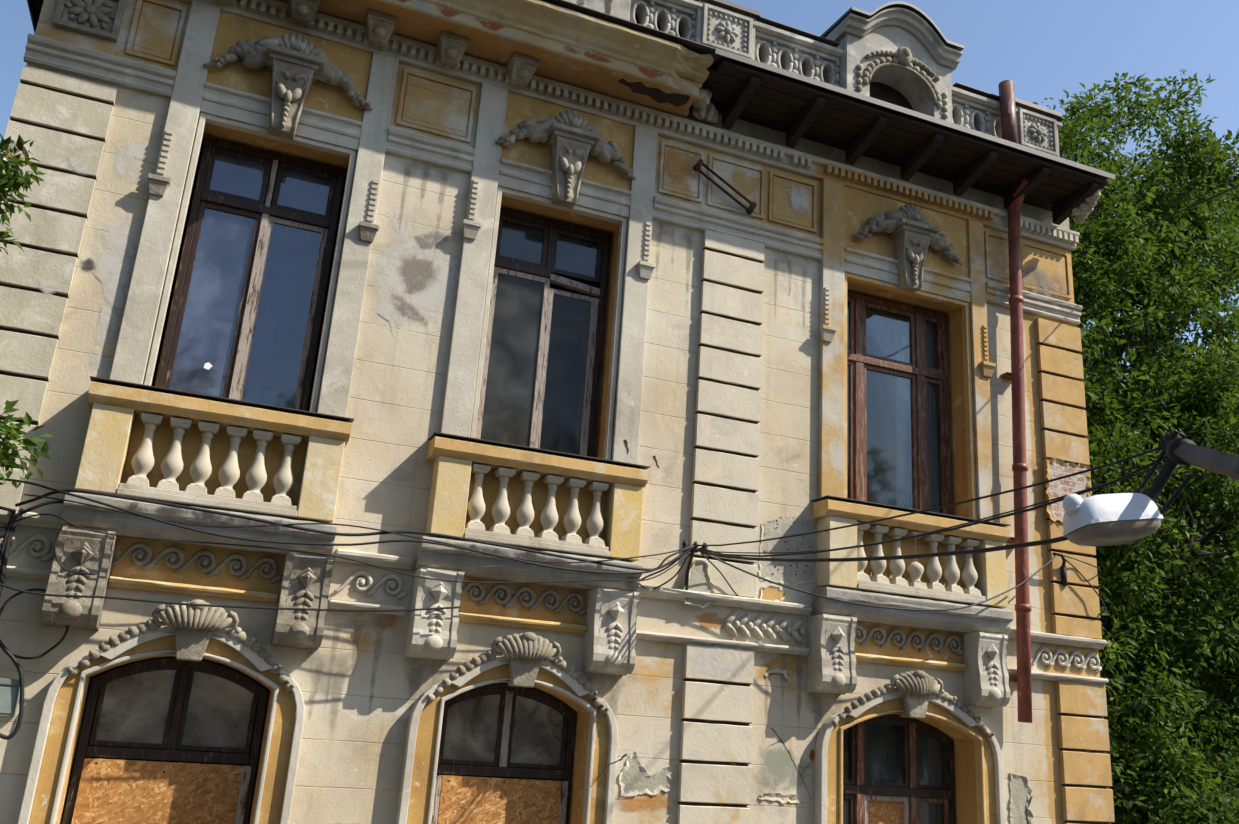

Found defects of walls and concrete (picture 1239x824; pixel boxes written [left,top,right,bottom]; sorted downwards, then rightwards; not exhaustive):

damp [396,234,446,324]
spalling [1045,458,1092,523]
spalling [618,751,672,797]
peeling [1009,773,1033,824]